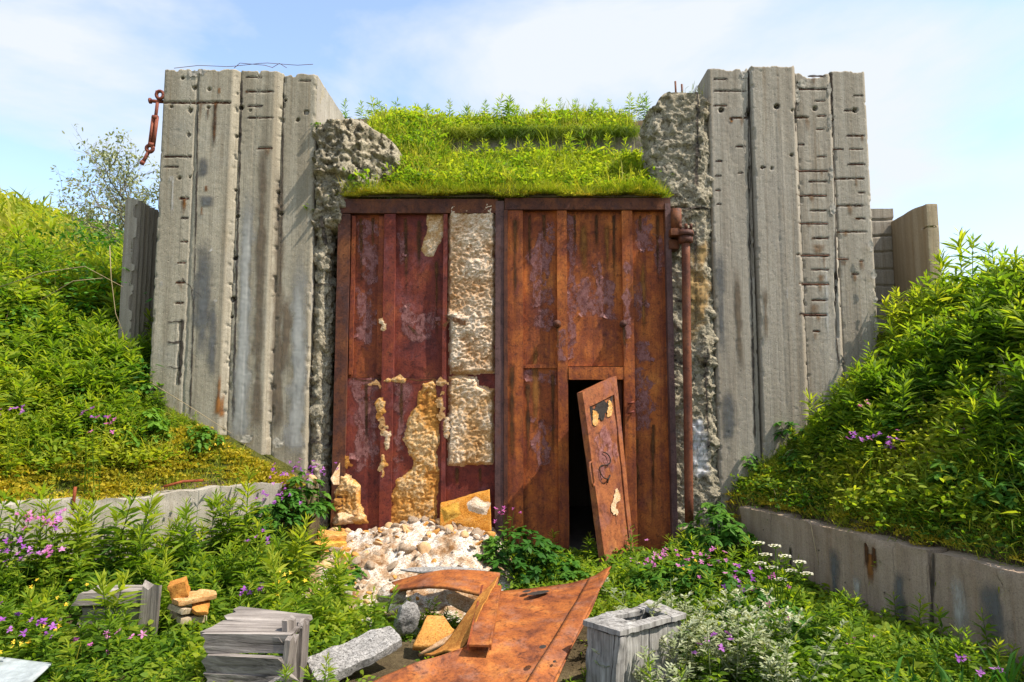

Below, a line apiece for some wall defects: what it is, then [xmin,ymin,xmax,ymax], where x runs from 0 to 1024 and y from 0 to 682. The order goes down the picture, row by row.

peeling [354,220,379,345]
rust [404,218,421,275]
rust [513,215,546,289]
peeling [523,214,657,431]
rust [216,382,224,416]
peeling [349,378,379,472]
rust [510,350,555,455]
rust [864,543,876,578]